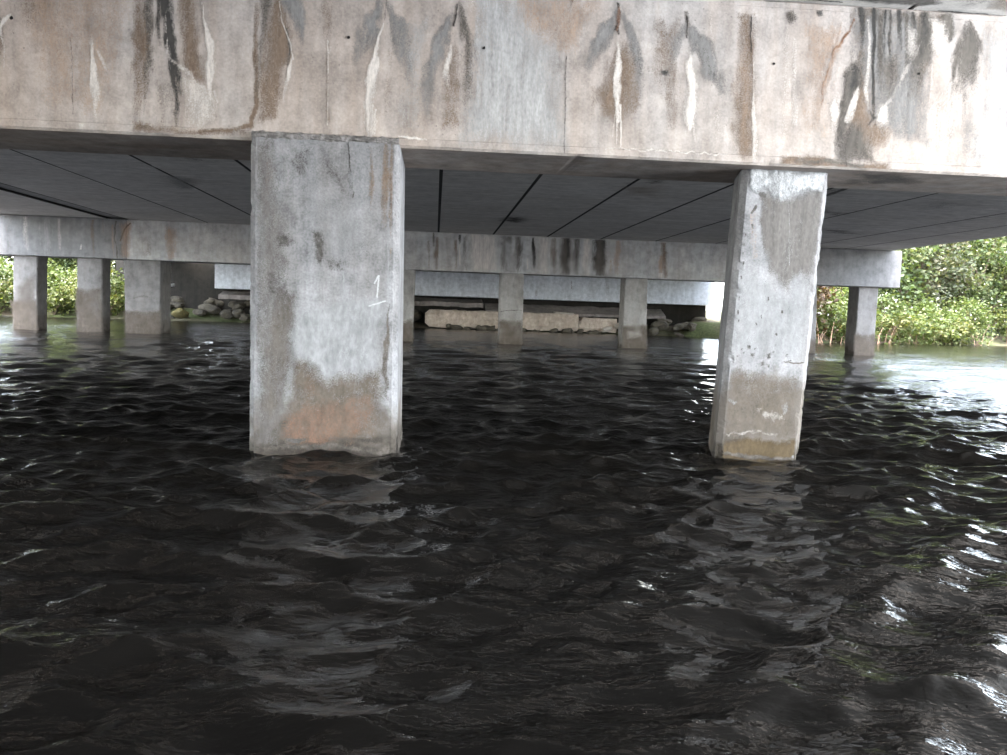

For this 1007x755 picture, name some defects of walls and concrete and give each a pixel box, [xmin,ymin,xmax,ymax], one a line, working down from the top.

damp [0,0,307,136]
damp [300,0,759,323]
damp [779,0,1007,197]
corrosion [278,355,386,451]